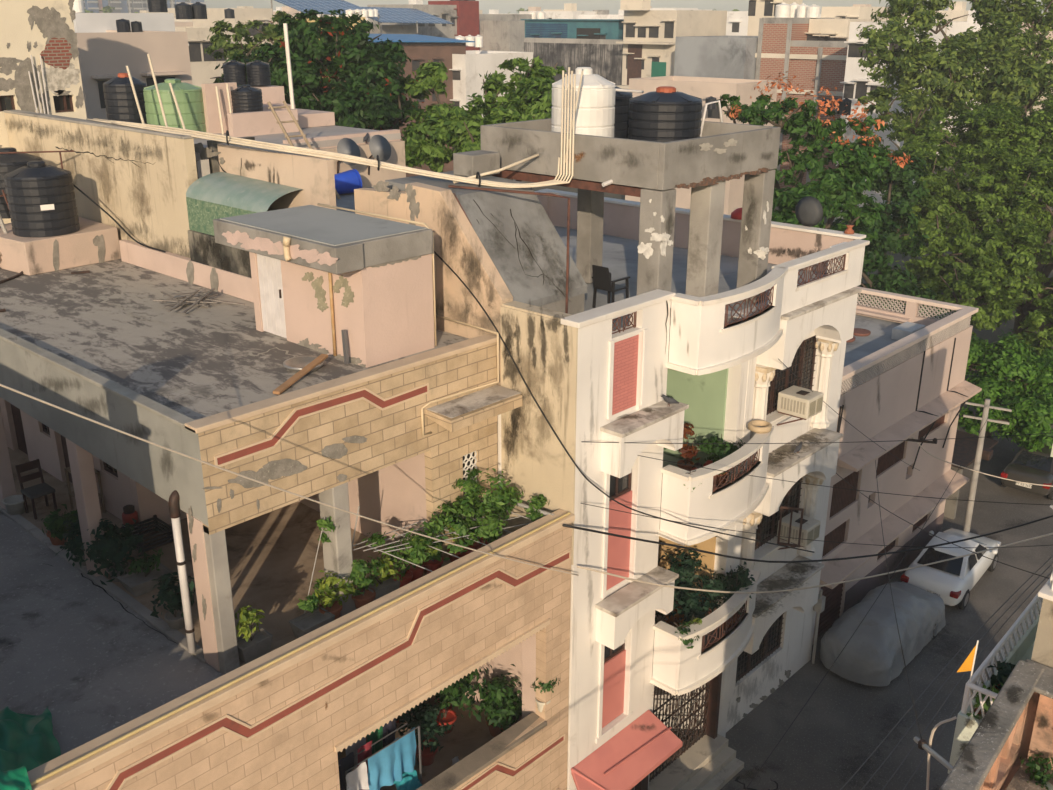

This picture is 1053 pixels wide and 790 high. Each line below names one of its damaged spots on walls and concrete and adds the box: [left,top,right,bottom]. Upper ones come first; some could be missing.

flaking render [0,0,85,114]
peeling [222,230,354,312]
crack [473,199,570,301]
peeling [637,199,673,259]
leakage [502,316,569,385]
peeling [228,458,308,488]
peeling [321,435,367,459]
leakage [504,396,524,456]